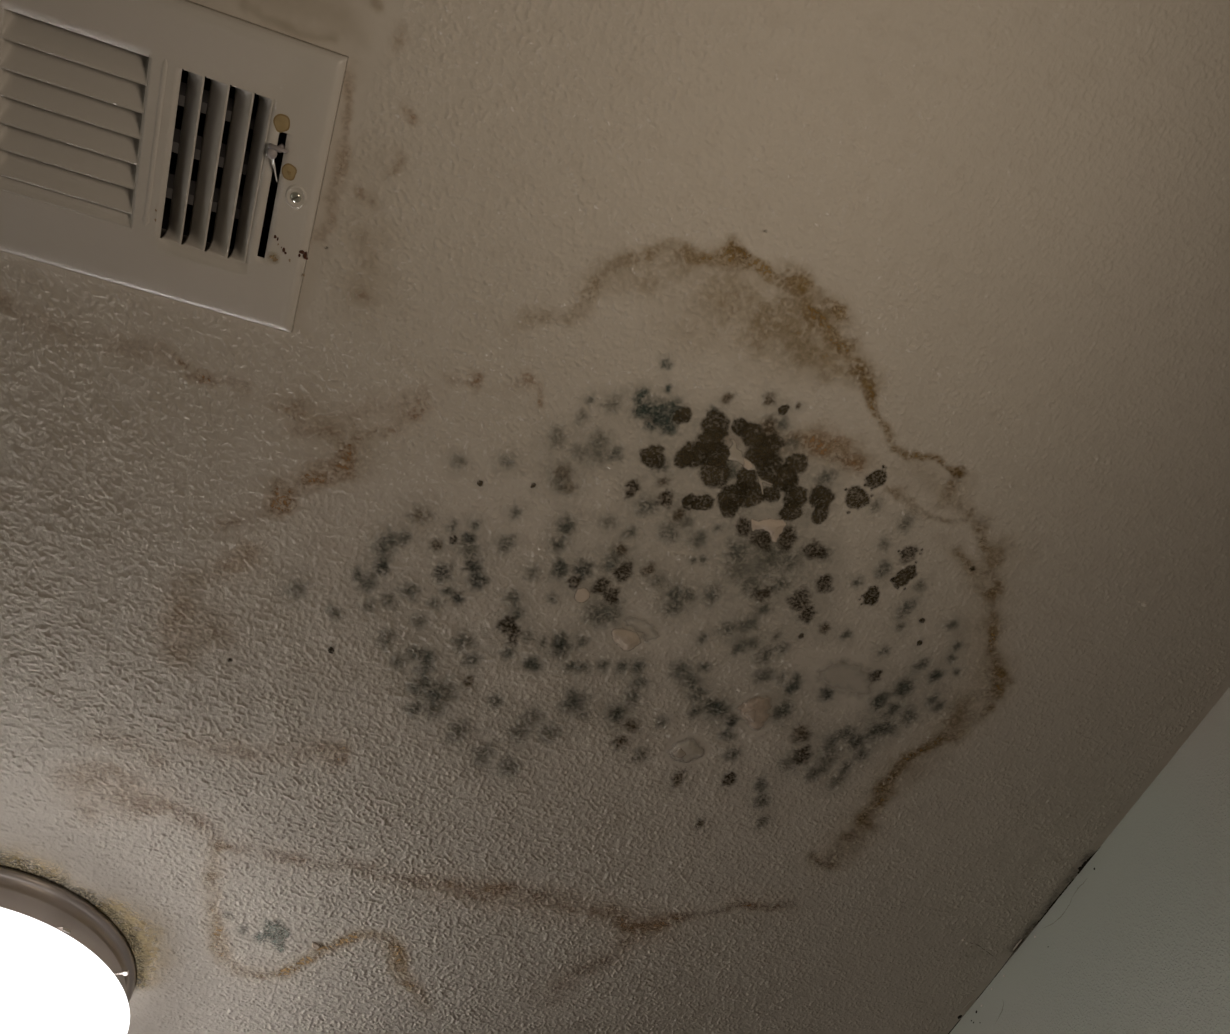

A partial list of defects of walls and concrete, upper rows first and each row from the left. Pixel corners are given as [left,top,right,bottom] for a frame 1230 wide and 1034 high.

water stain [684,242,772,279]
water stain [855,366,961,476]
water stain [626,386,886,571]
water stain [433,524,486,587]
water stain [498,597,520,657]
water stain [559,545,659,620]
water stain [788,575,831,638]
water stain [855,547,923,627]